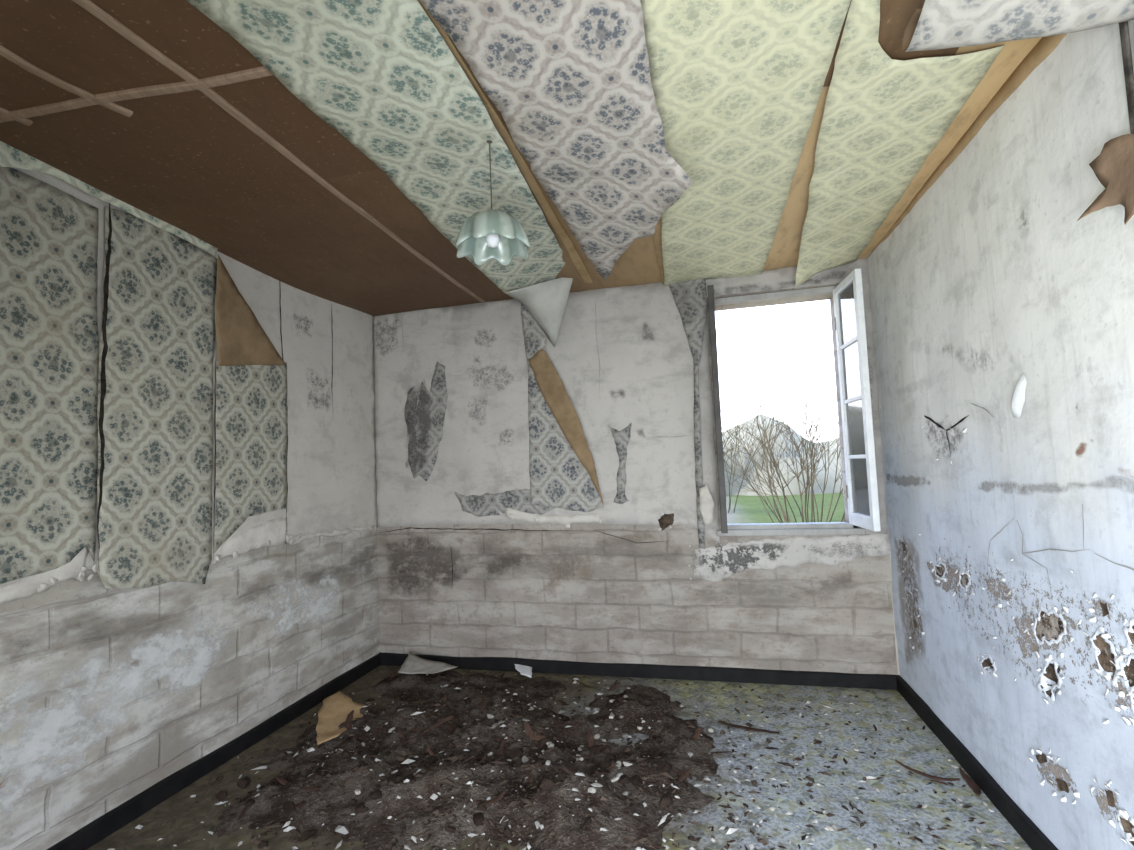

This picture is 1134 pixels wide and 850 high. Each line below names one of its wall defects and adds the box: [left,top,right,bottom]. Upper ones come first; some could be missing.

peeling [215,255,286,366]
spalling [211,517,294,564]
leakage [259,548,370,633]
leakage [390,538,458,592]
leakage [0,620,226,810]
peeling [1028,748,1134,848]